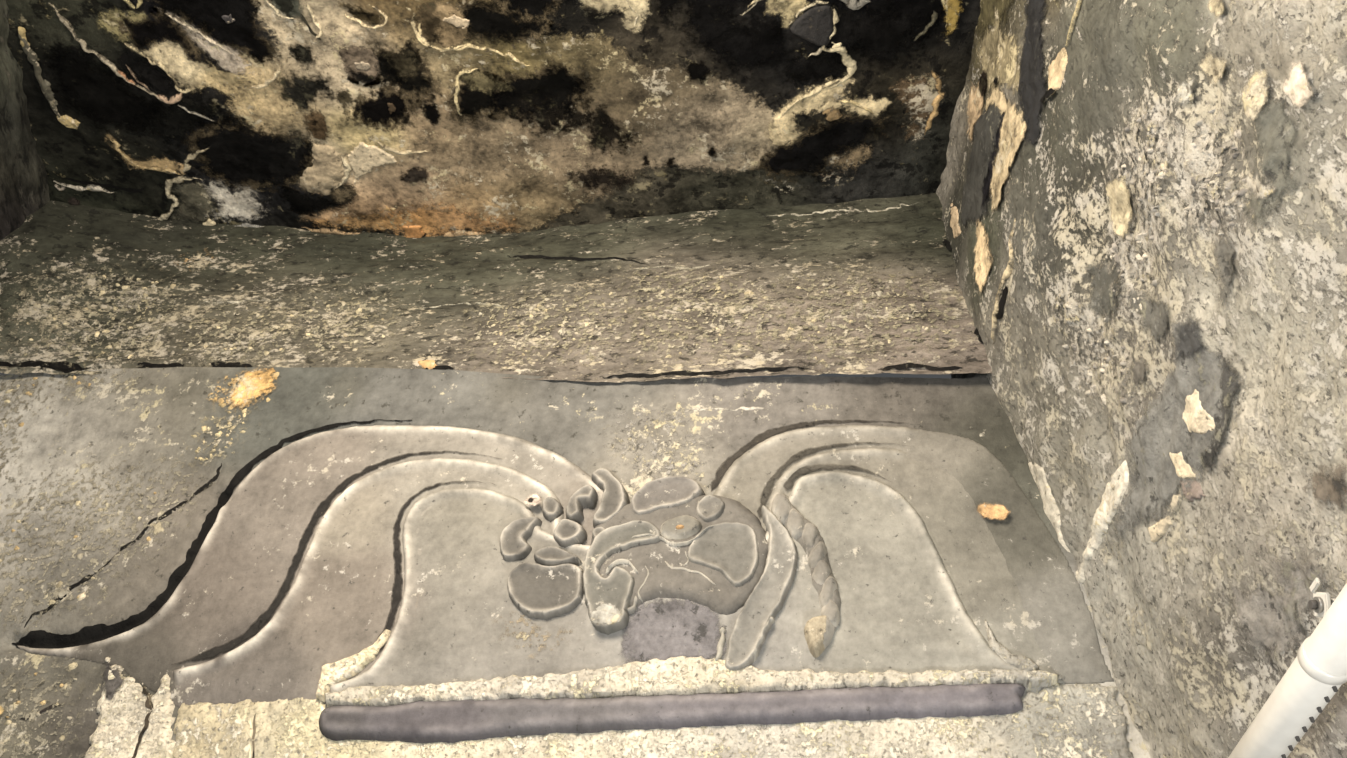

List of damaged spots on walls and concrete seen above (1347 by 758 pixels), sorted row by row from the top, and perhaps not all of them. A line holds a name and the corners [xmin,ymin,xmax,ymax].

water stain [18,27,80,129]
water stain [203,179,267,228]
crack [24,463,222,628]